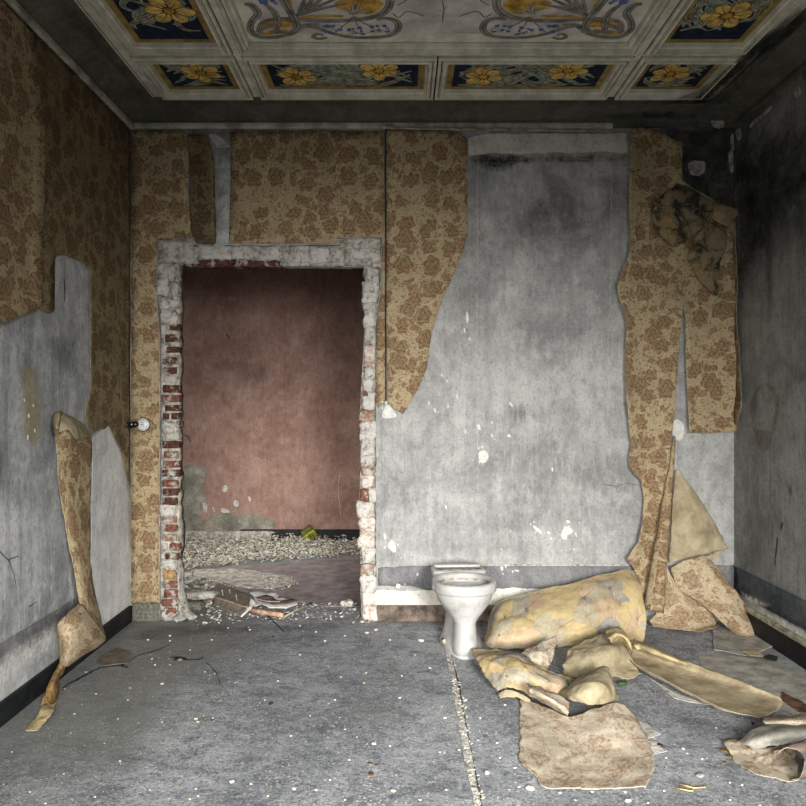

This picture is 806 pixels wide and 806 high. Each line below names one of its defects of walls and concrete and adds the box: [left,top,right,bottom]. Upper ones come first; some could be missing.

flaking render [468,133,627,156]
peeling [688,160,706,176]
damp [668,128,806,278]
flaking render [381,401,396,419]
flaking render [672,420,691,441]
flaking render [472,446,489,463]
flaking render [182,463,276,531]
flaking render [91,426,131,625]
flaking render [527,520,580,540]
peeling [650,469,754,637]
flaking render [191,568,296,589]
flaking render [488,587,543,605]